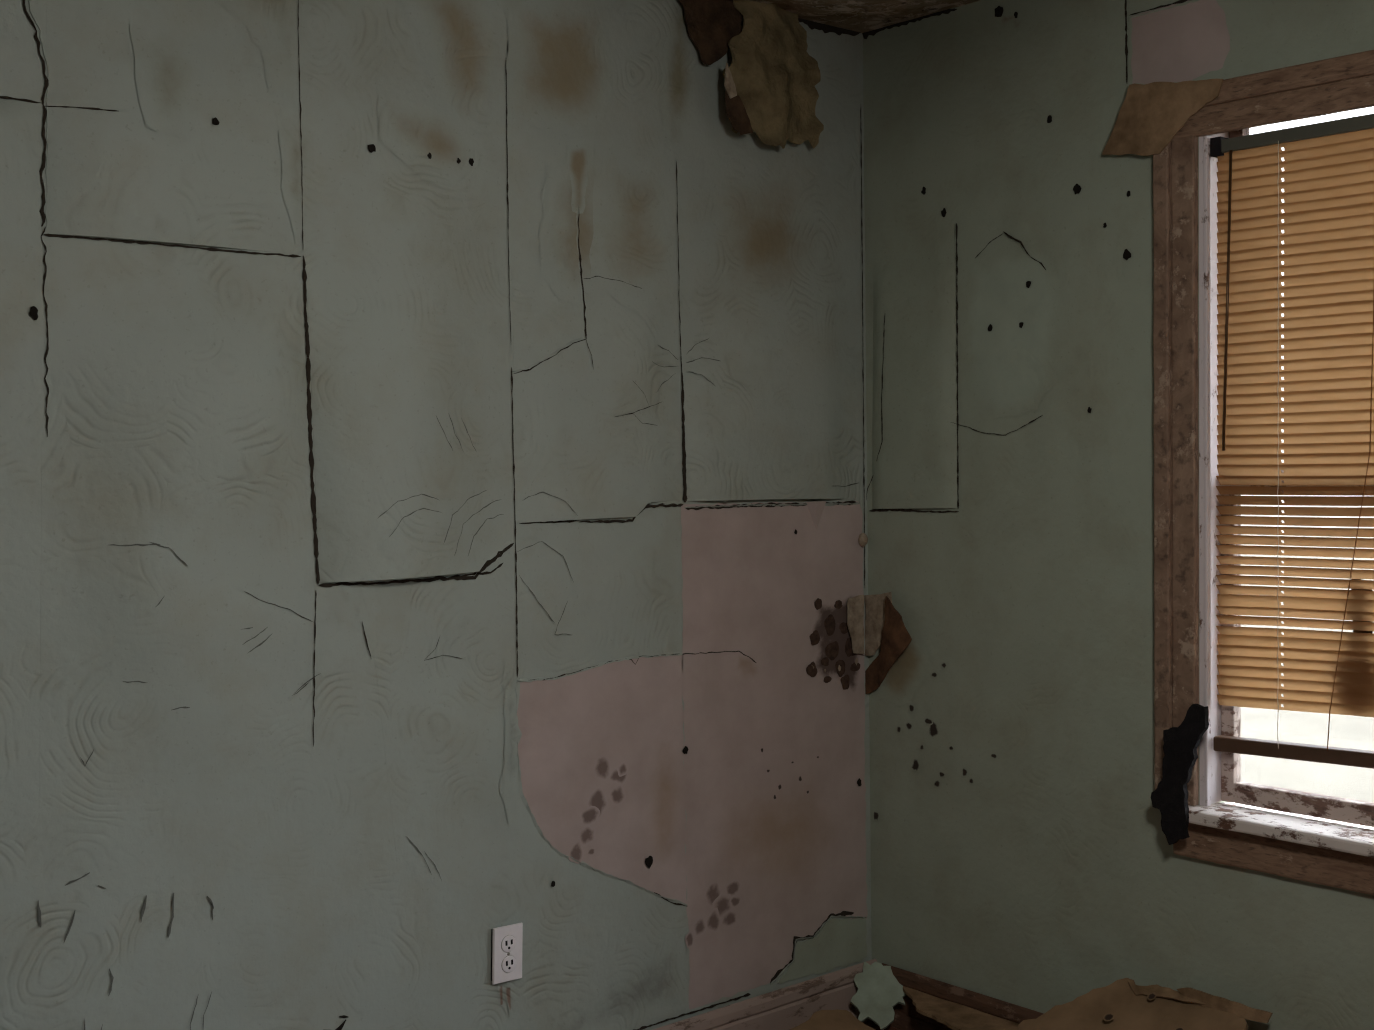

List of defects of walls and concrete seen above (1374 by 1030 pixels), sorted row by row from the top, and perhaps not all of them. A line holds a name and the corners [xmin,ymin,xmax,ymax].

peeling [791,0,926,16]
crack [0,0,687,746]
peeling [515,500,868,1009]
leakage [544,725,880,1030]